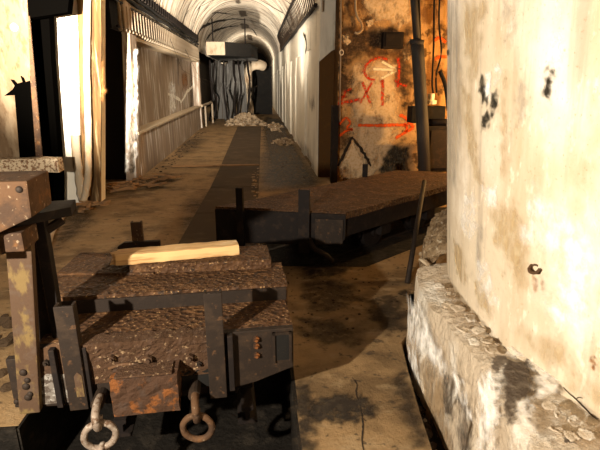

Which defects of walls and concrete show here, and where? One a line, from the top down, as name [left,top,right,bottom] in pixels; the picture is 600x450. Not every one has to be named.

water stain [380,139,410,173]
water stain [512,350,559,397]
crack [359,415,367,450]
water stain [514,401,532,439]